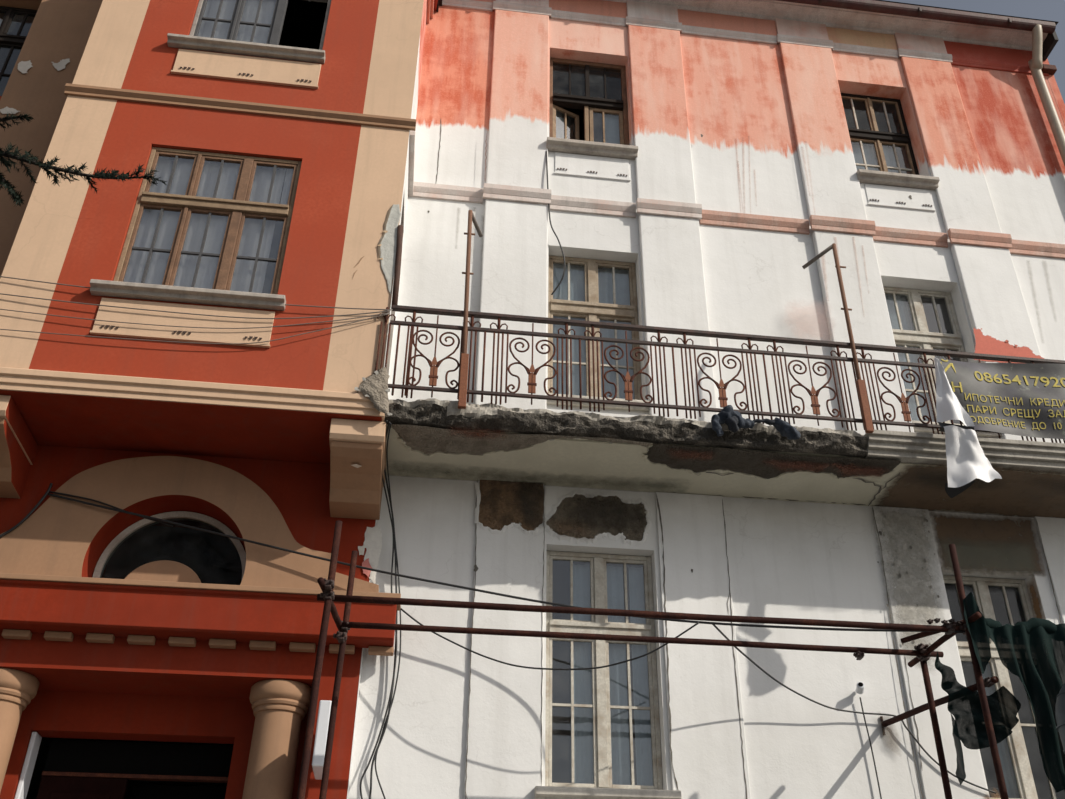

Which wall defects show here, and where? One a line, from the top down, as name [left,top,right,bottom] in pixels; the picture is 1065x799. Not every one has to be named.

peeling [18,60,33,73]
peeling [52,58,70,71]
flaking render [377,204,401,294]
peeling [974,328,1044,363]
spalling [354,365,901,480]
flaking render [474,480,653,546]